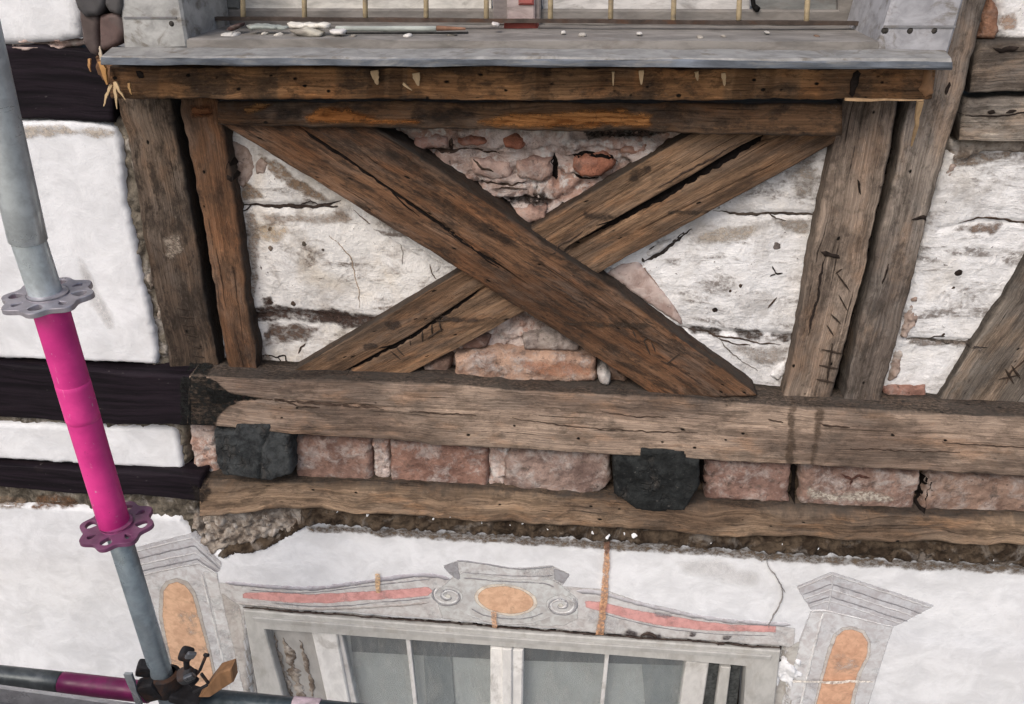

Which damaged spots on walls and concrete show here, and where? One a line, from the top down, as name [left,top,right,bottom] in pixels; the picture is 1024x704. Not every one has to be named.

crack [243,200,403,264]
crack [550,135,763,255]
crack [713,210,813,221]
crack [960,216,1024,224]
crack [641,229,780,371]
crack [821,423,1024,514]
spalling [192,508,304,559]
crack [243,554,785,648]
corrosion [596,541,610,635]
peeling [274,633,315,697]